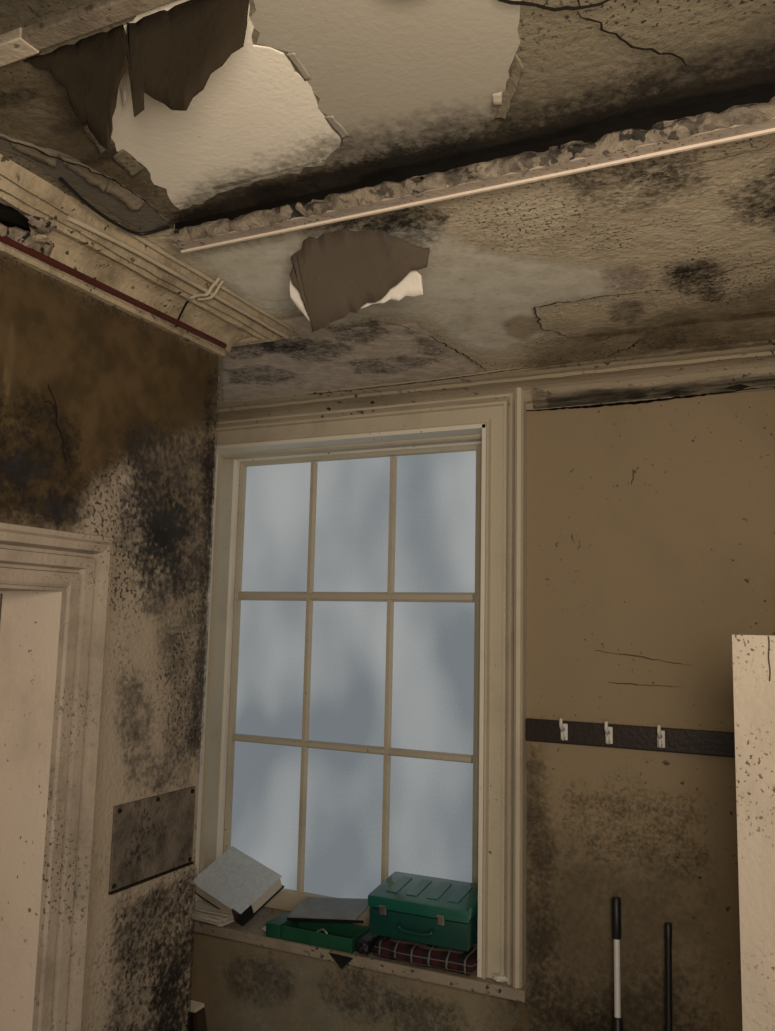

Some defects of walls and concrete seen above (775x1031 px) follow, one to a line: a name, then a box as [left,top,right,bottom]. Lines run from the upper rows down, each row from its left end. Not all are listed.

crack [498,0,710,69]
leakage [317,208,449,248]
peeling [0,0,775,352]
leakage [173,48,775,224]
leakage [666,260,729,301]
leakage [533,376,775,409]
leakage [0,253,478,787]
leakage [109,869,197,1031]